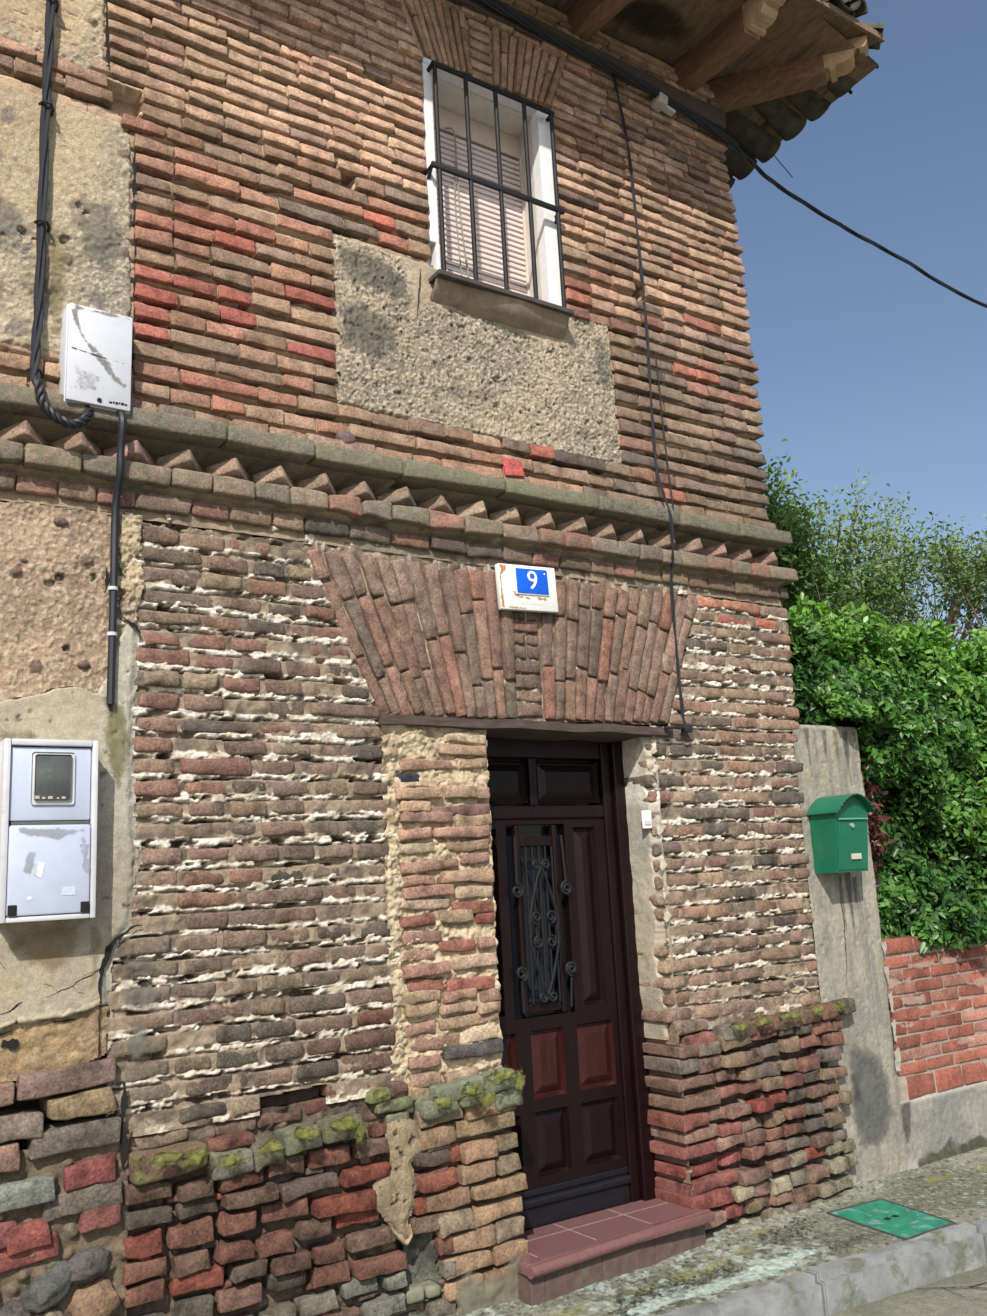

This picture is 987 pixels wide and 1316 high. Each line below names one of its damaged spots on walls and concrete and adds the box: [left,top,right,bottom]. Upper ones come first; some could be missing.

damp [617,2,687,42]
damp [340,248,405,295]
damp [345,306,395,357]
crack [0,925,142,1061]
damp [851,956,962,1143]
damp [919,1136,987,1167]